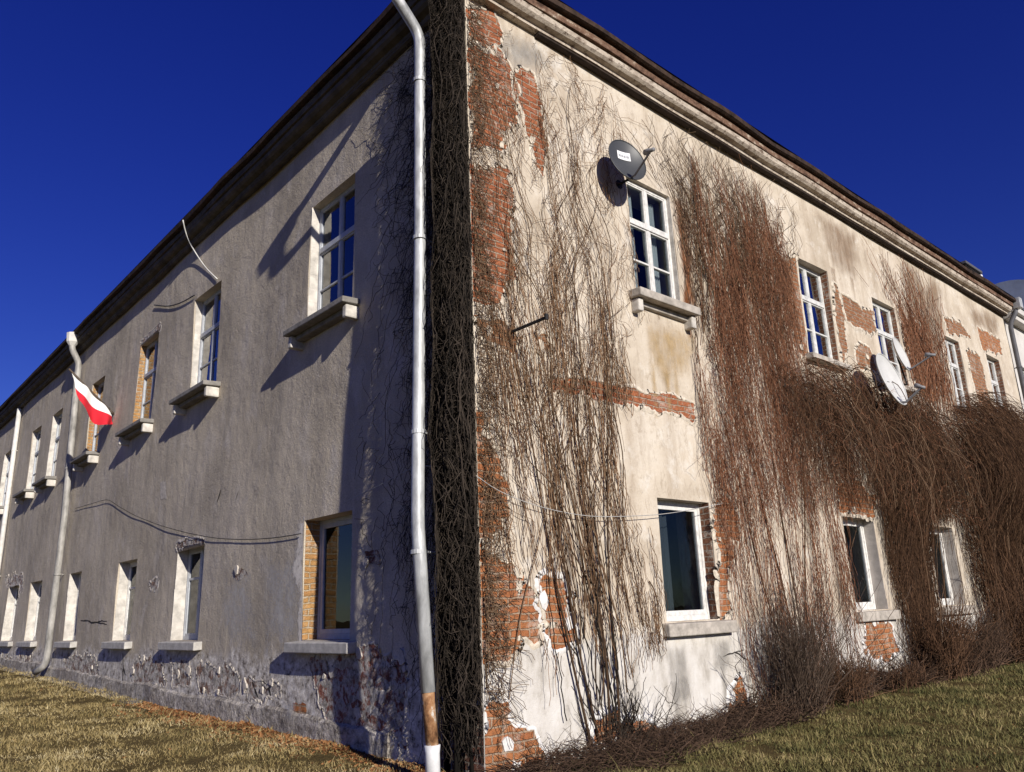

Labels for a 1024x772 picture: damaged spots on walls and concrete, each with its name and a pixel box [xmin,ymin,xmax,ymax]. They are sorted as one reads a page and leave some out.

flaking render [465,4,557,358]
flaking render [549,371,696,425]
flaking render [831,280,878,376]
flaking render [895,303,941,406]
flaking render [942,315,1002,406]
flaking render [433,402,580,772]
flaking render [861,611,902,665]
flaking render [130,641,411,761]